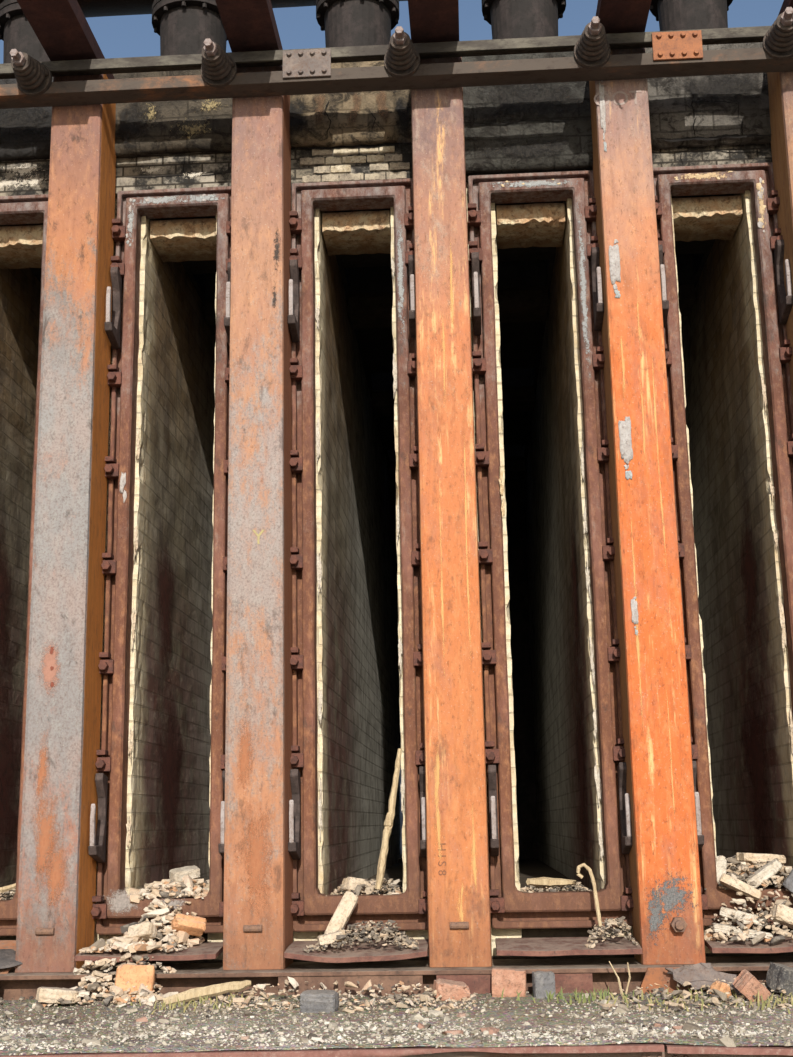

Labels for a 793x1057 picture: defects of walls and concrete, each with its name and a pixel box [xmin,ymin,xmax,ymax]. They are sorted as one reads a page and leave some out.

peeling [609,239,621,298]
peeling [618,416,633,480]
leakage [740,514,759,645]
rust [42,642,60,694]
leakage [0,689,21,871]
rust [35,748,65,900]
leakage [741,681,772,853]
peeling [647,873,697,945]